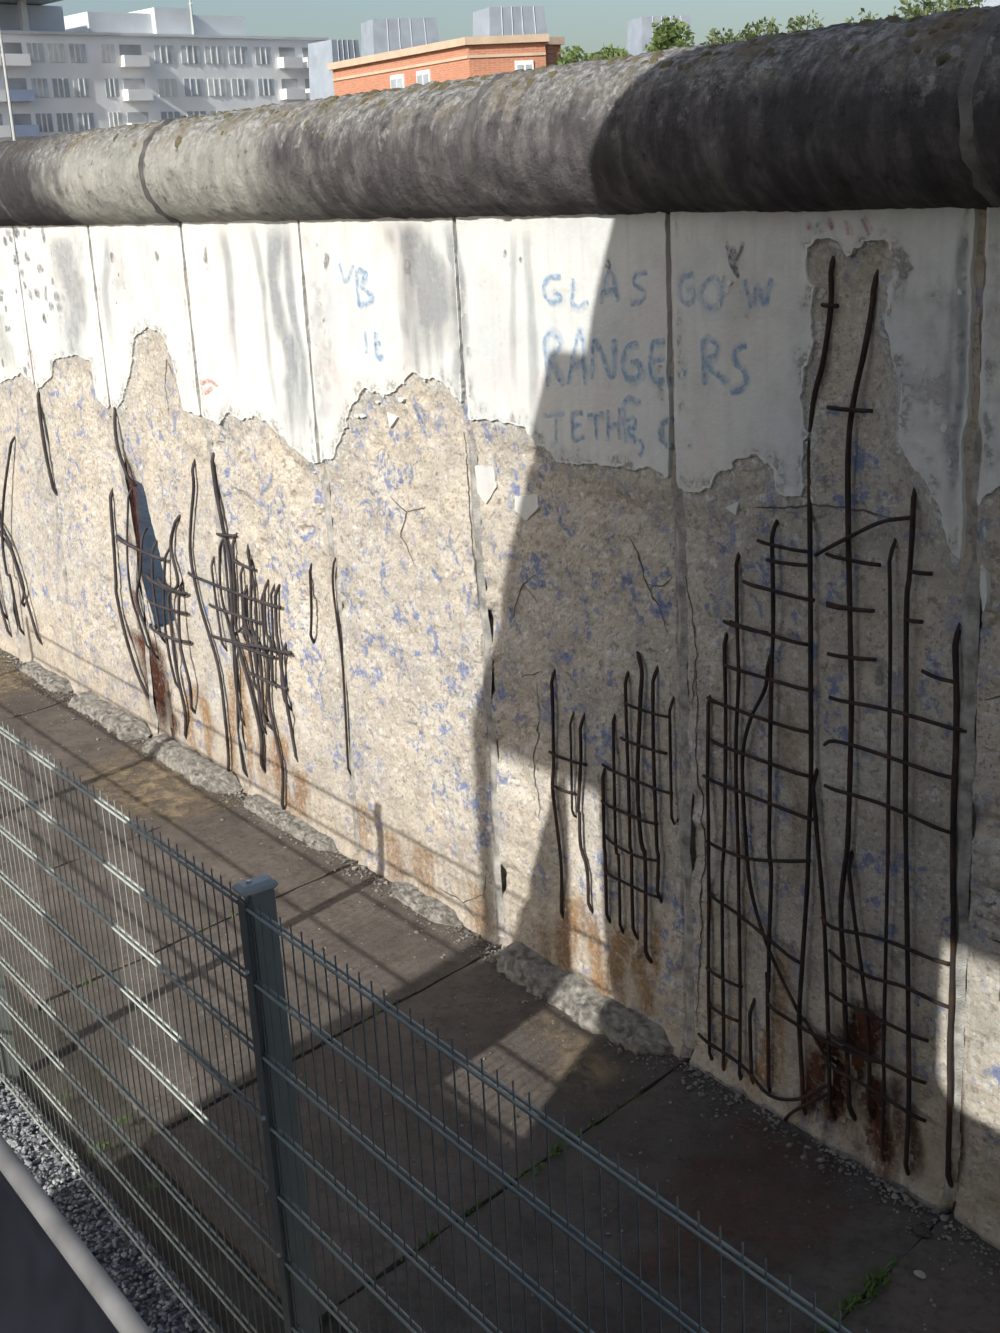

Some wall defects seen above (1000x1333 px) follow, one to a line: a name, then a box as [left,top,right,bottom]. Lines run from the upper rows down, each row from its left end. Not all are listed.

damp [269,239,297,393]
damp [401,233,460,329]
corrosion [123,453,140,553]
corrosion [132,592,211,755]
corrosion [228,641,266,775]
corrosion [273,738,307,810]
spalling [0,209,1000,1250]
corrosion [558,900,658,1011]
corrosion [805,1003,921,1177]